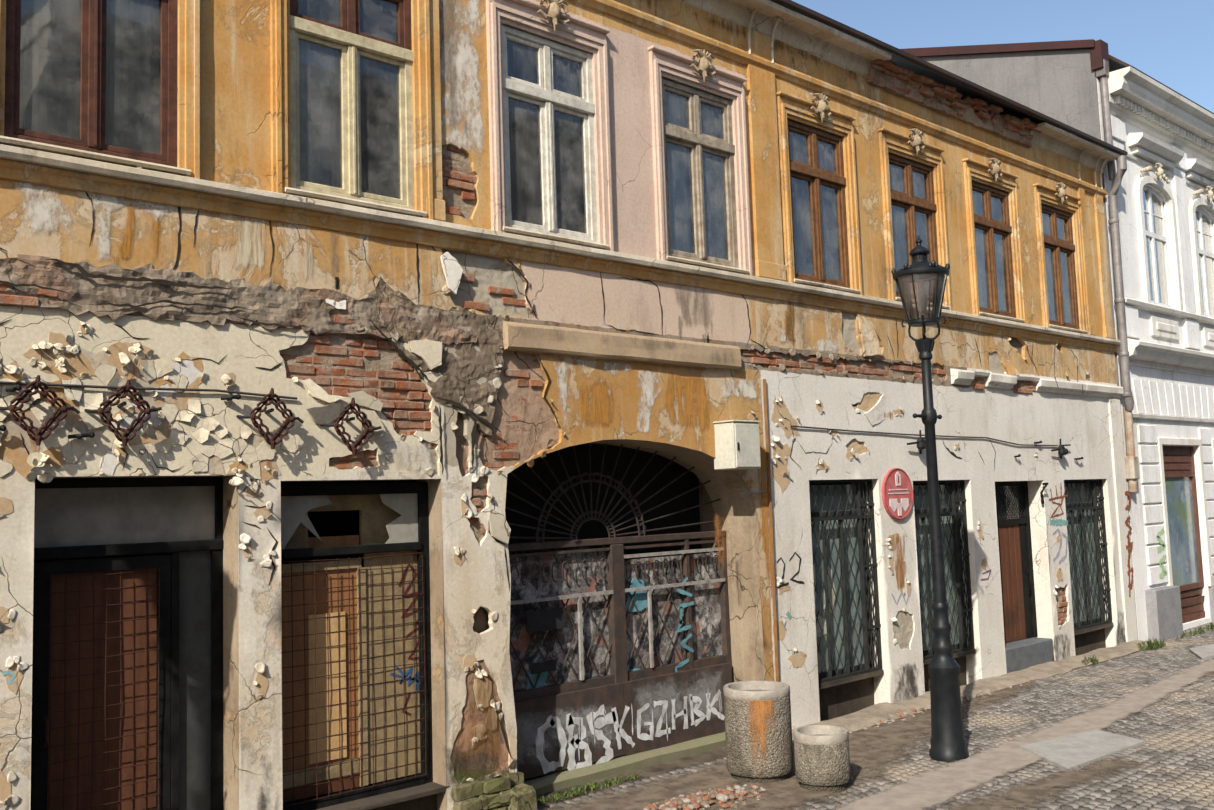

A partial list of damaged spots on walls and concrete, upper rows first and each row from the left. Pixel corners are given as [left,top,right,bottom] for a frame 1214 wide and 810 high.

spalling [866,59,1042,148]
spalling [442,144,477,220]
crack [0,192,308,339]
spalling [441,249,536,320]
spalling [740,307,946,384]
crack [122,448,182,472]
spalling [279,328,439,480]
spalling [451,347,565,566]
peeling [747,395,800,494]
spalling [827,430,870,461]
spalling [885,533,914,650]
spalling [450,654,516,782]